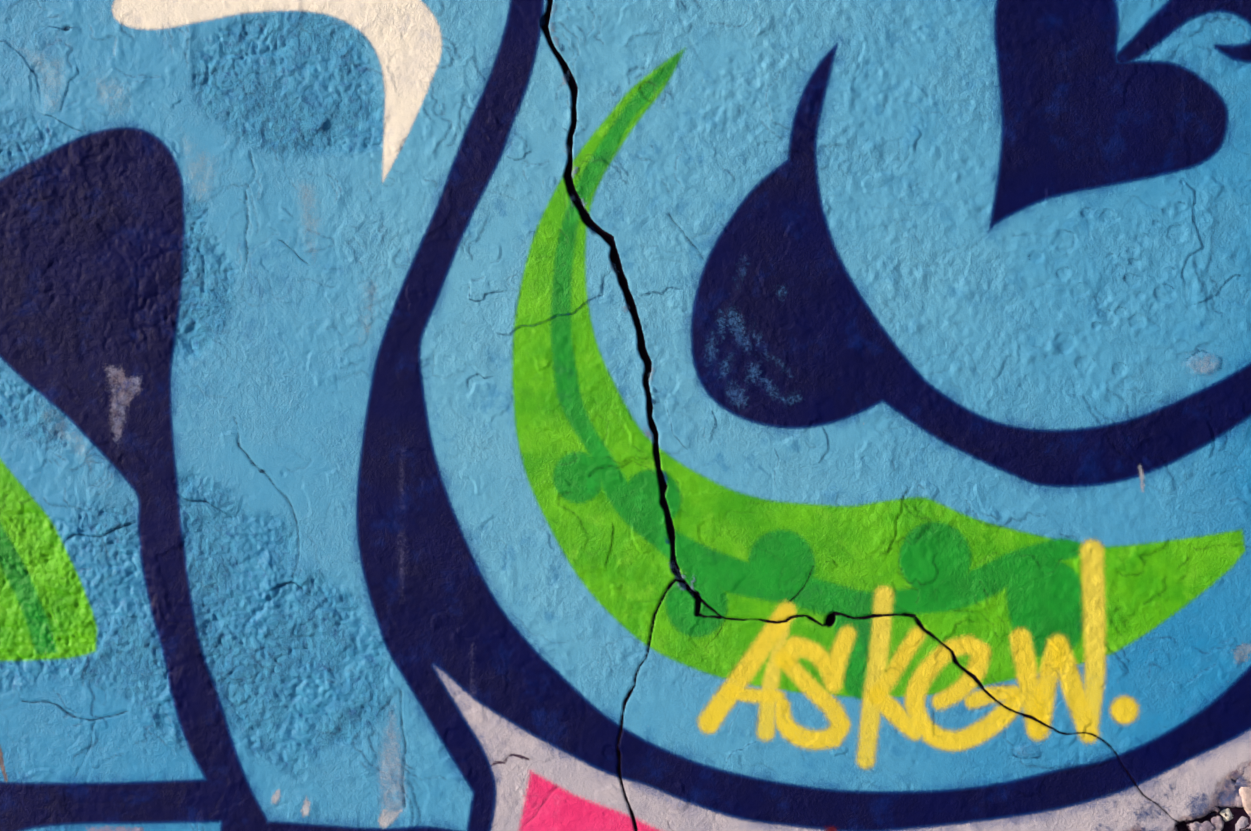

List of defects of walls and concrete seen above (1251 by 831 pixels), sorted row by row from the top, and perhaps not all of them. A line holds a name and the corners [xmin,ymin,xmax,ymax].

crack [538,0,1187,831]
spalling [1093,761,1251,831]